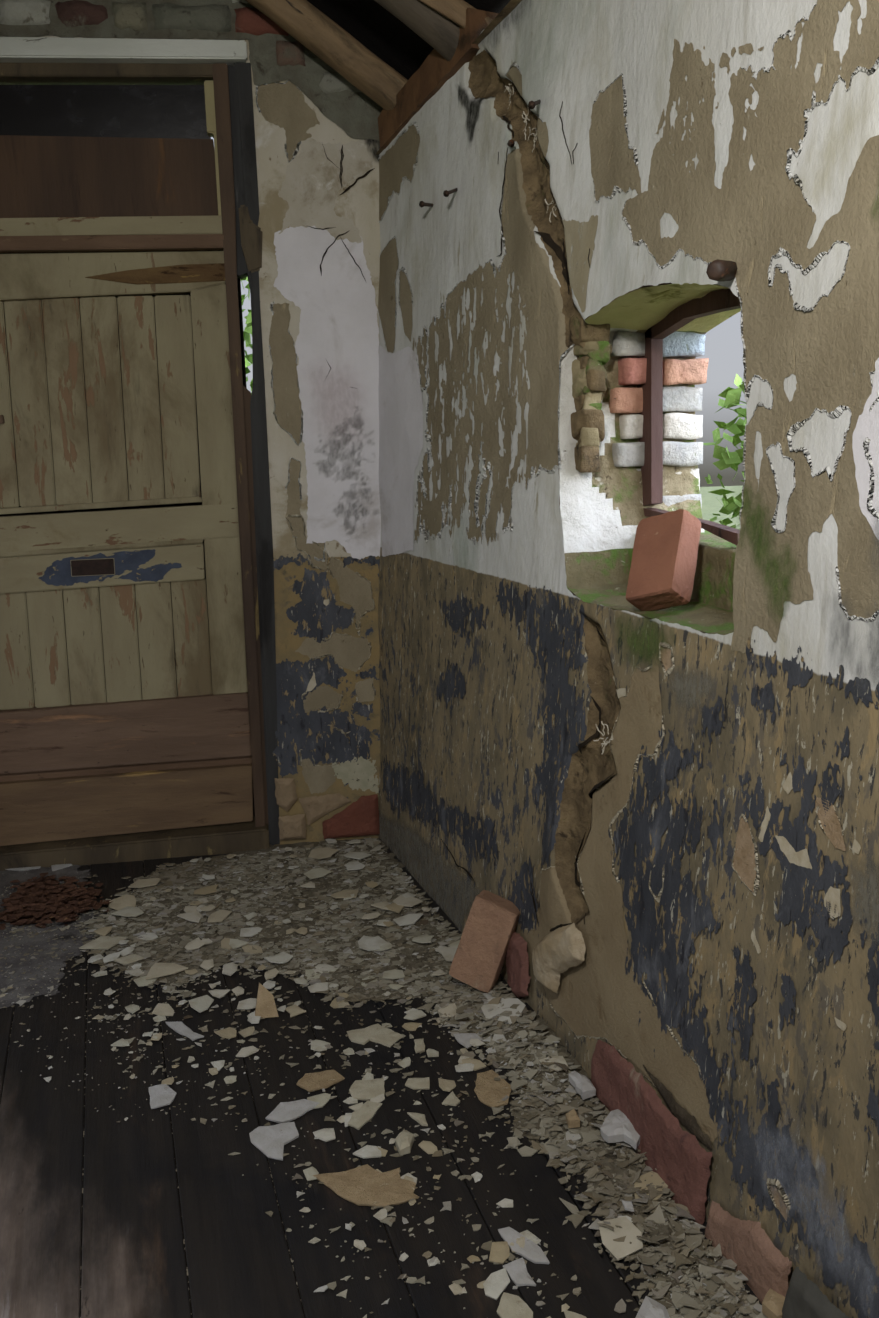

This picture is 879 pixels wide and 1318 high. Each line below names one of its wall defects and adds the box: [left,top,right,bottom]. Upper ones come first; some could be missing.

peeling [255,80,320,163]
crack [308,226,366,281]
crack [322,144,375,195]
crack [468,50,590,348]
peeling [377,0,879,725]
crack [441,839,475,882]
flaking render [269,301,879,1318]
crack [530,617,621,932]